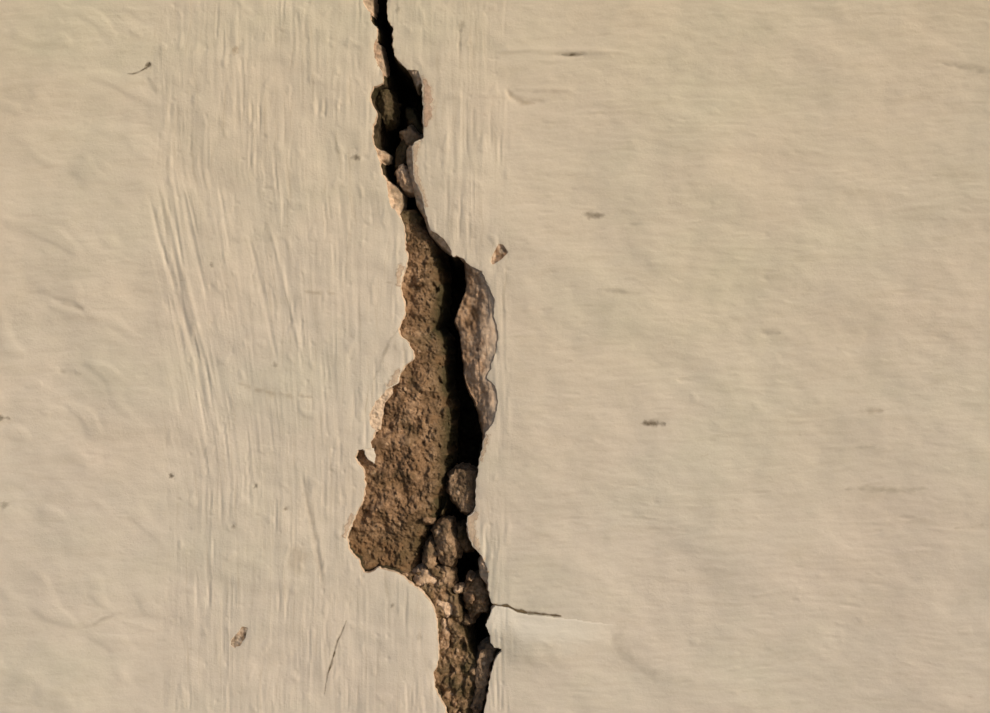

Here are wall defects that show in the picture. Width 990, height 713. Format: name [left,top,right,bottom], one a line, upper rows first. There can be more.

crack [343,0,561,713]
peeling [491,244,508,264]